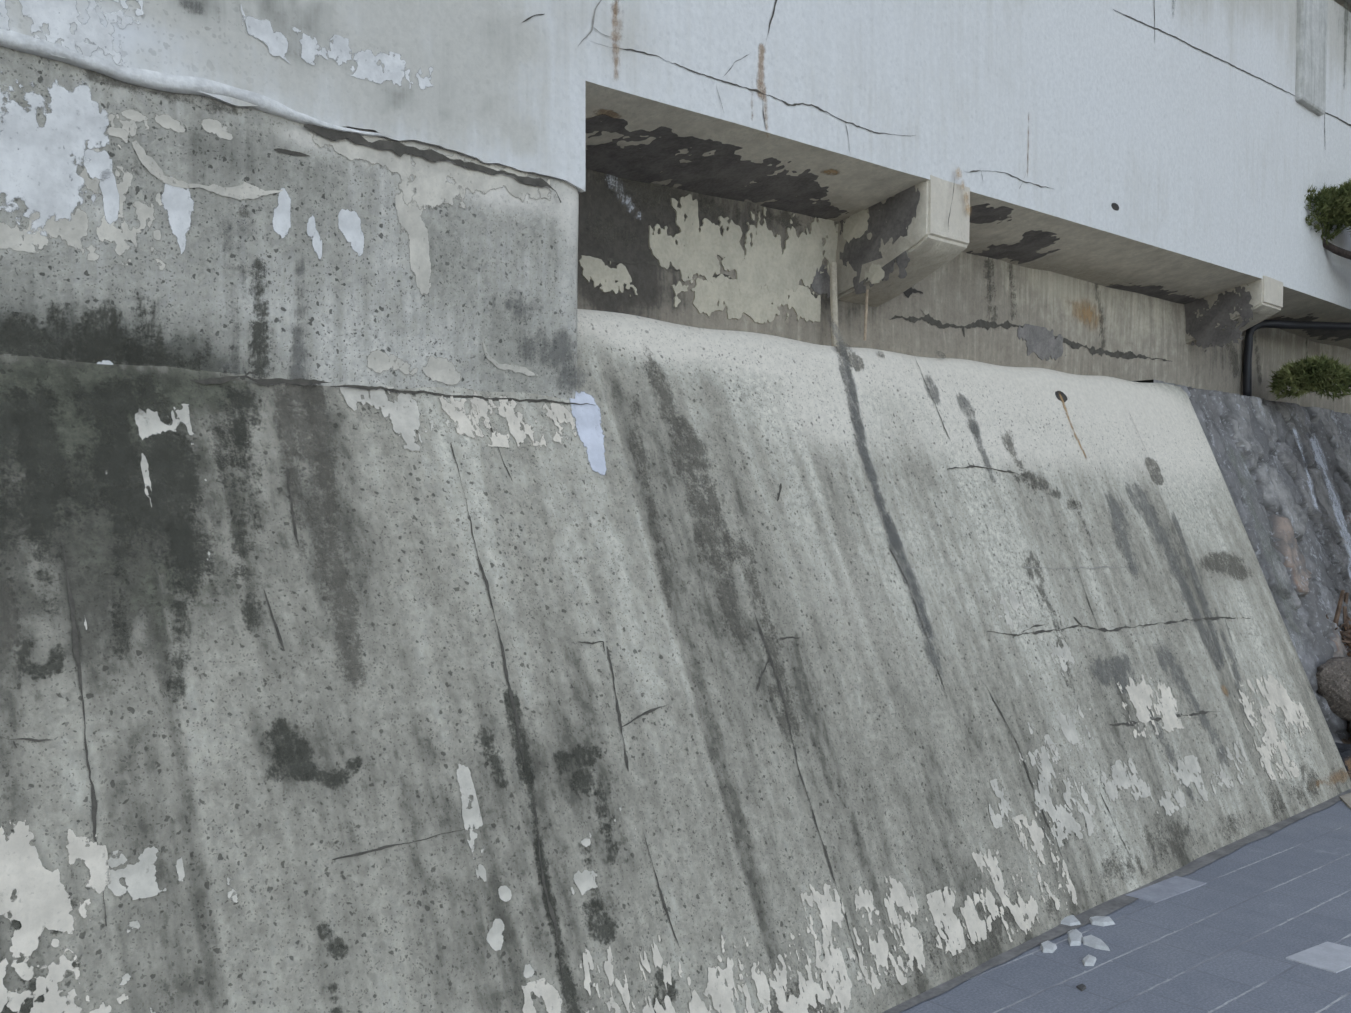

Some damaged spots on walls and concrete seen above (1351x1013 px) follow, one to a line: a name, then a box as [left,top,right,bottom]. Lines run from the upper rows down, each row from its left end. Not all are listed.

peeling [0,71,233,270]
crack [578,0,914,151]
peeling [579,114,923,341]
water stain [74,298,167,572]
water stain [215,259,365,686]
water stain [16,639,64,679]
crack [62,544,98,845]
water stain [167,514,196,695]
crack [451,444,564,989]
crack [989,565,1251,644]
peeling [0,820,185,1013]
peeling [579,674,1313,1013]